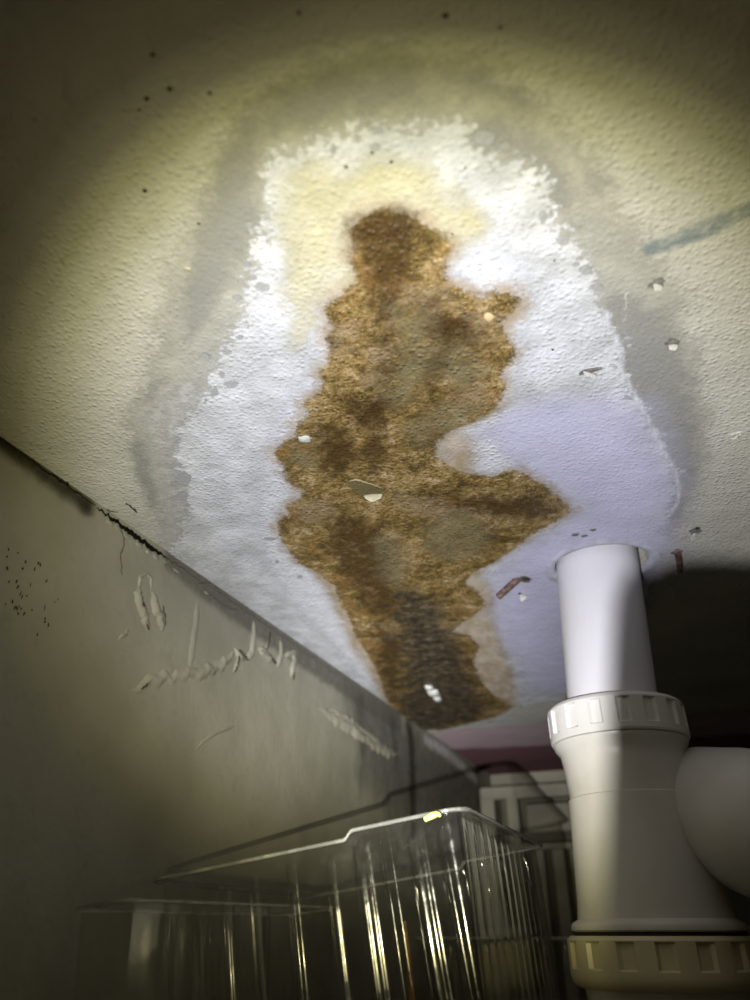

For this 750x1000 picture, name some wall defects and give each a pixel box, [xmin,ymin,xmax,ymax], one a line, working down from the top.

peeling [647,278,664,291]
water stain [126,53,713,727]
peeling [579,367,602,378]
peeling [664,339,680,351]
peeling [349,479,383,502]
rust [273,205,569,730]
crack [0,437,283,637]
peeling [130,601,297,693]